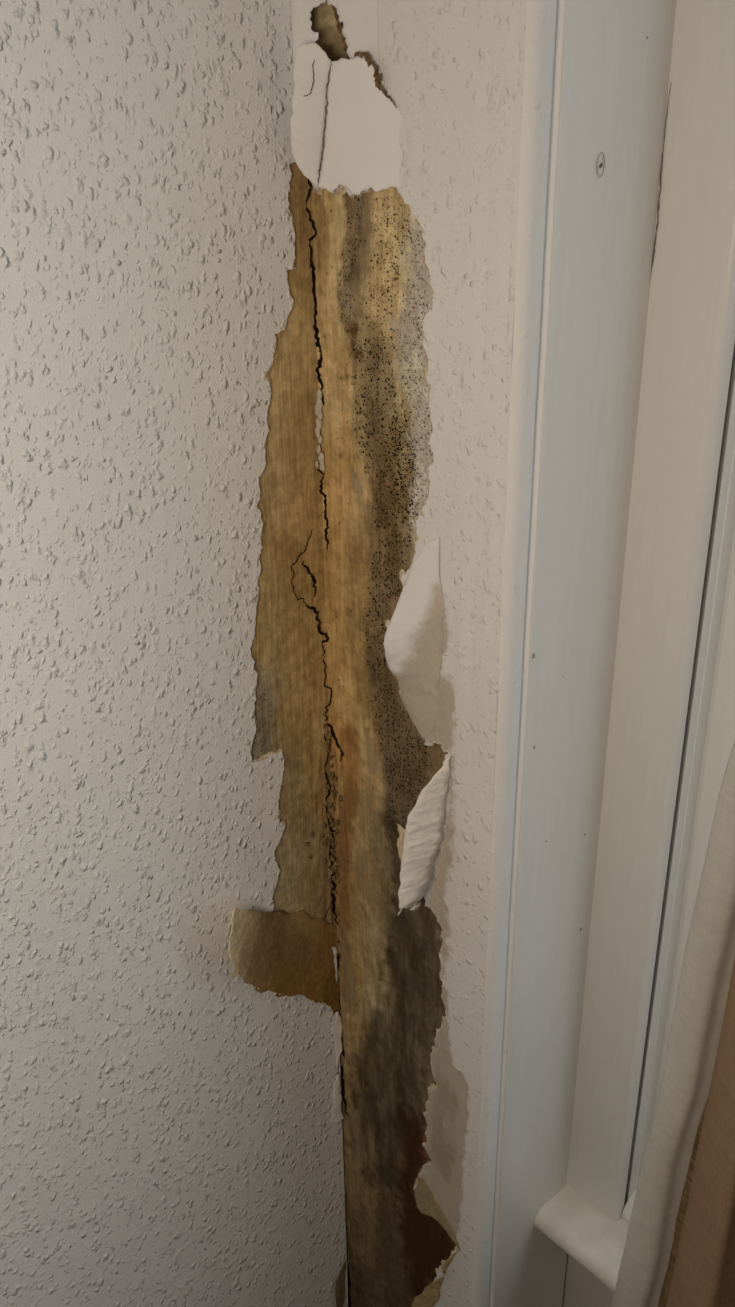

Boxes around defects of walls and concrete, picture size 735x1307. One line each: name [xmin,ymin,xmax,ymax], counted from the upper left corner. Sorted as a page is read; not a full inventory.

crack [304,60,331,405]
spalling [310,2,350,62]
water stain [337,192,454,842]
crack [291,457,348,1117]
water stain [351,823,467,1236]
crack [345,1267,353,1307]